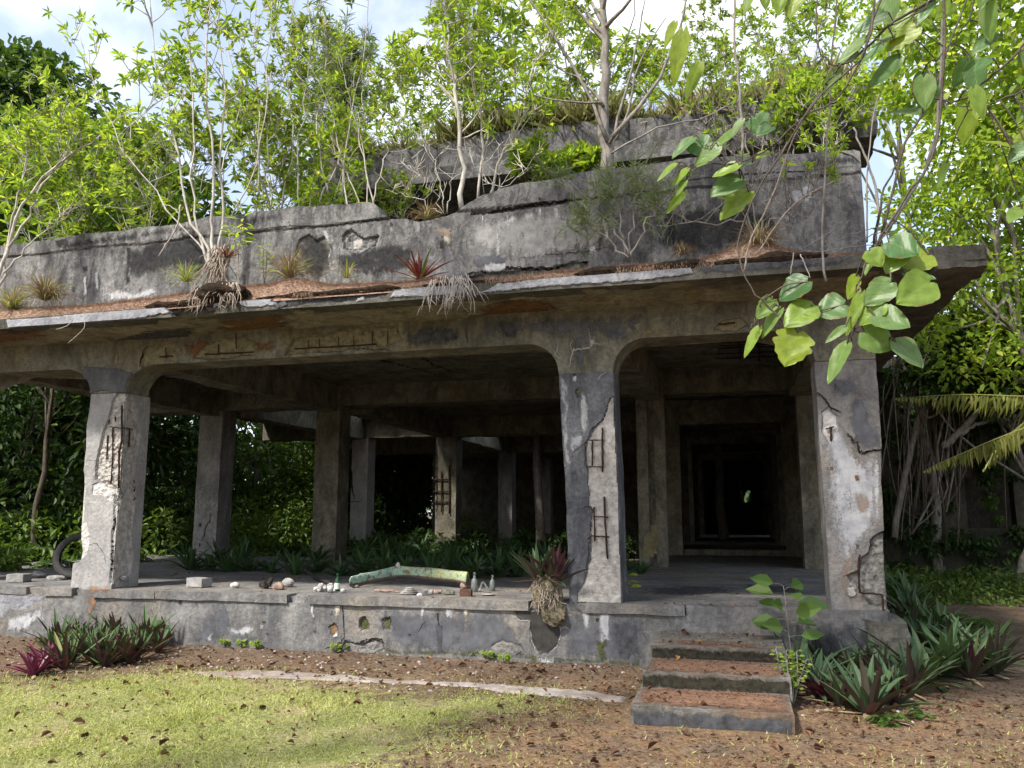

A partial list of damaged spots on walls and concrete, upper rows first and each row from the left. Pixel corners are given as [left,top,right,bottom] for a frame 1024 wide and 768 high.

spalling [343,230,378,254]
crack [555,329,601,367]
spalling [80,333,259,588]
spalling [566,397,621,603]
crack [587,372,618,472]
flaking render [817,392,911,672]
crack [324,605,385,654]